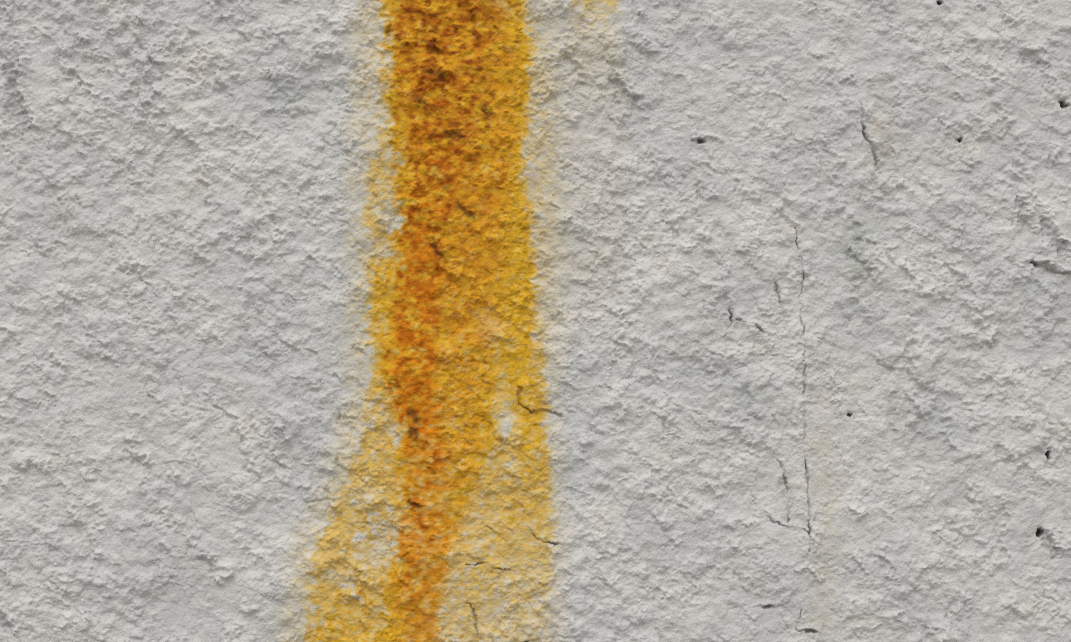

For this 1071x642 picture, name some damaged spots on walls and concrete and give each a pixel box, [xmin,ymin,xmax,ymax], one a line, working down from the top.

corrosion [265,0,632,642]
crack [721,227,813,547]